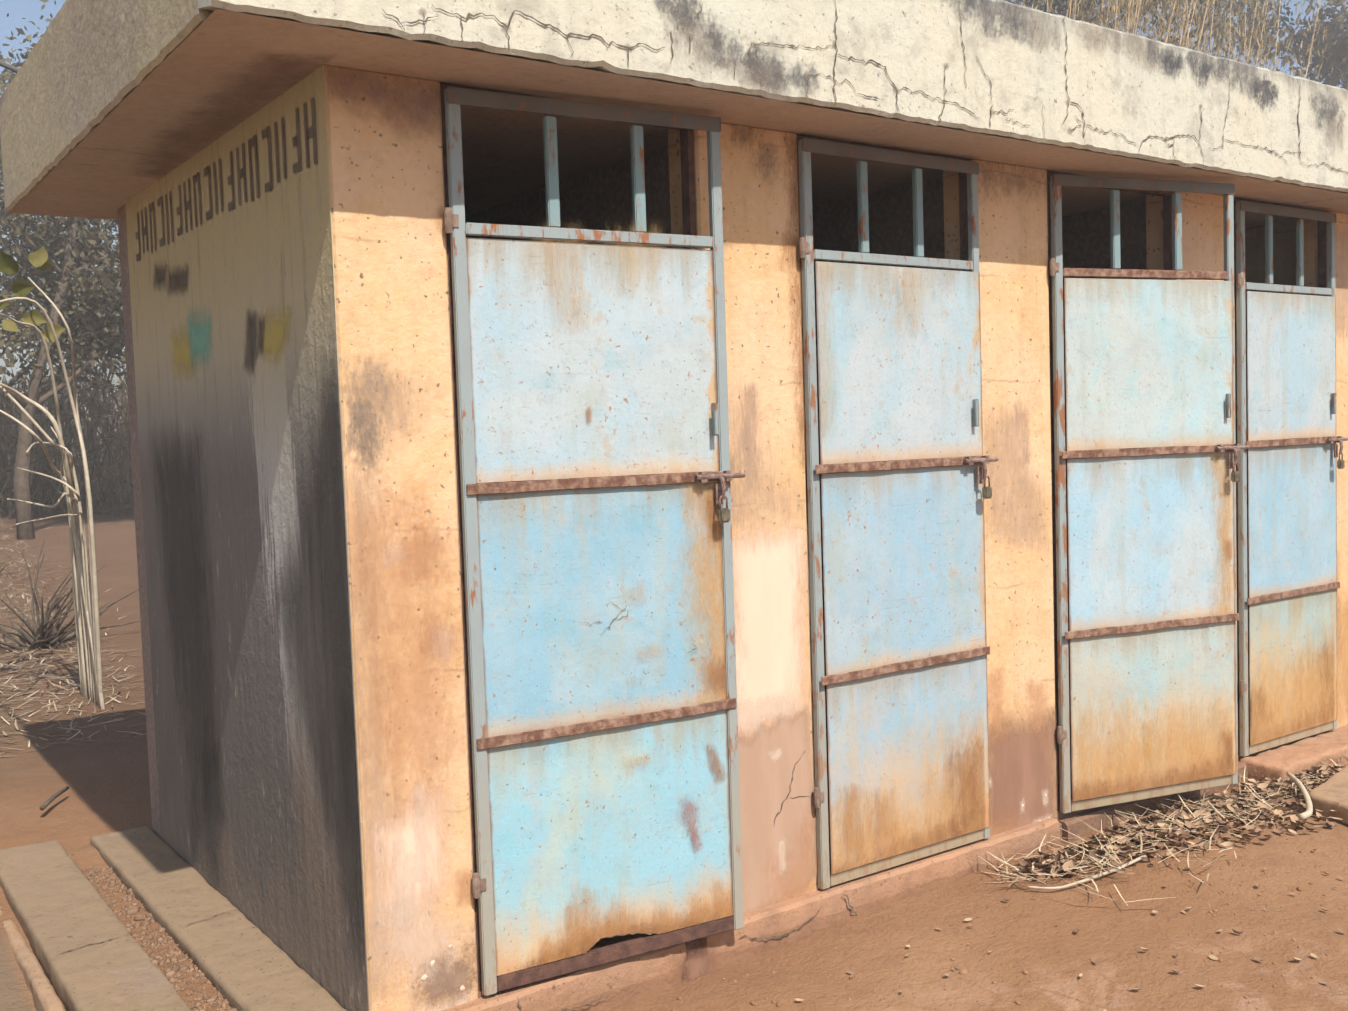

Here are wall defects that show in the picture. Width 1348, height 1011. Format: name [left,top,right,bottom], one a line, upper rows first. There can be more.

crack [383,3,703,67]
water stain [657,0,817,92]
crack [733,2,1348,173]
water stain [1150,43,1277,107]
water stain [1312,94,1338,128]
water stain [282,385,363,931]
rust [1251,649,1335,745]
rust [709,749,721,778]
crack [774,751,814,827]
rust [1074,734,1234,801]
water stain [375,786,443,924]
rust [540,899,733,965]